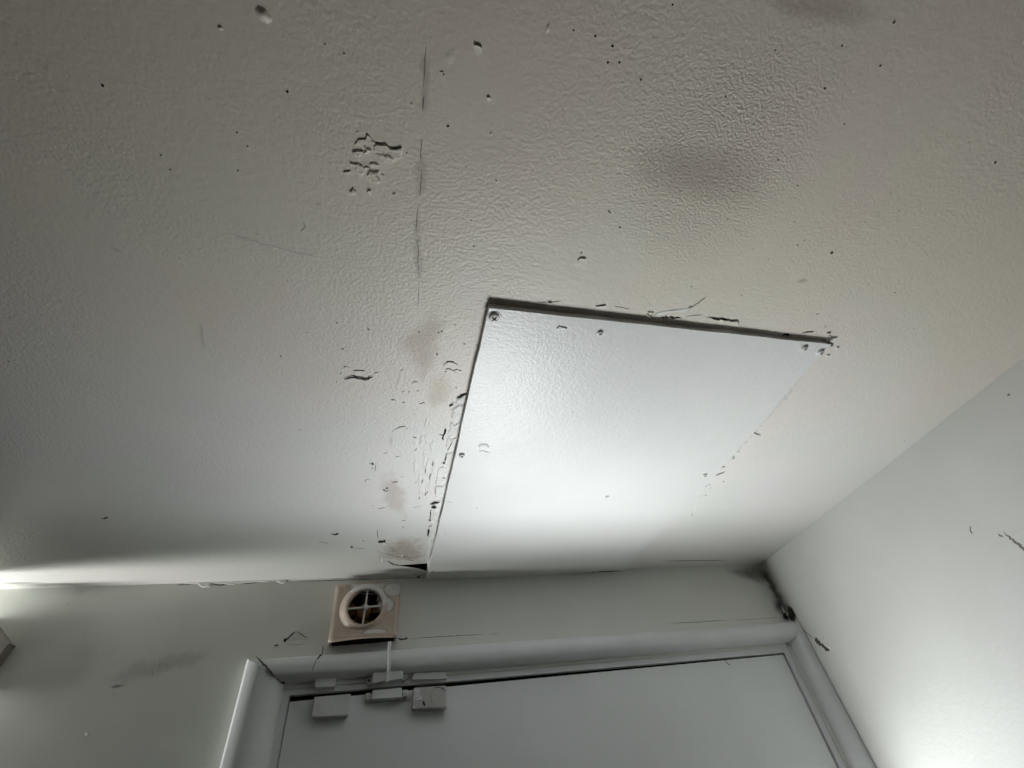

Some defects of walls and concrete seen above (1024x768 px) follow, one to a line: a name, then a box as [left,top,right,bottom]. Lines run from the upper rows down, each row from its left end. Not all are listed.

peeling [344,132,408,196]
peeling [336,366,380,382]
damp [782,606,796,621]
crack [256,656,285,684]